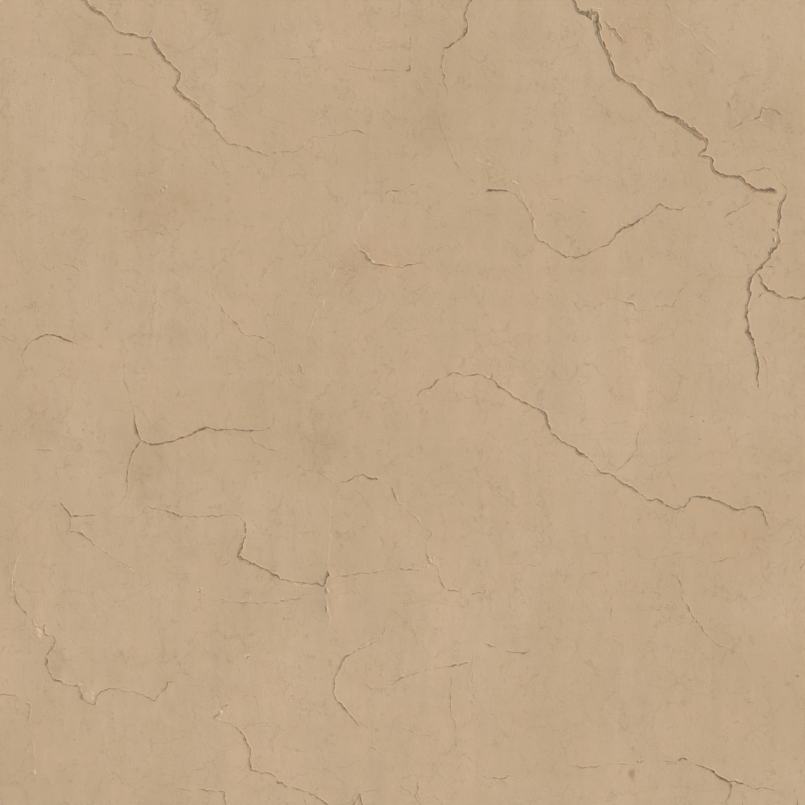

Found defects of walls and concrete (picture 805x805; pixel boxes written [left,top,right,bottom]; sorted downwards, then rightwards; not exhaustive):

crack [81,0,374,157]
crack [349,0,696,260]
crack [572,0,805,391]
crack [27,359,488,628]
crack [416,372,782,542]
crack [11,553,213,706]
crack [174,704,330,805]
crack [332,623,389,727]
crack [351,778,424,805]
crack [361,643,532,747]